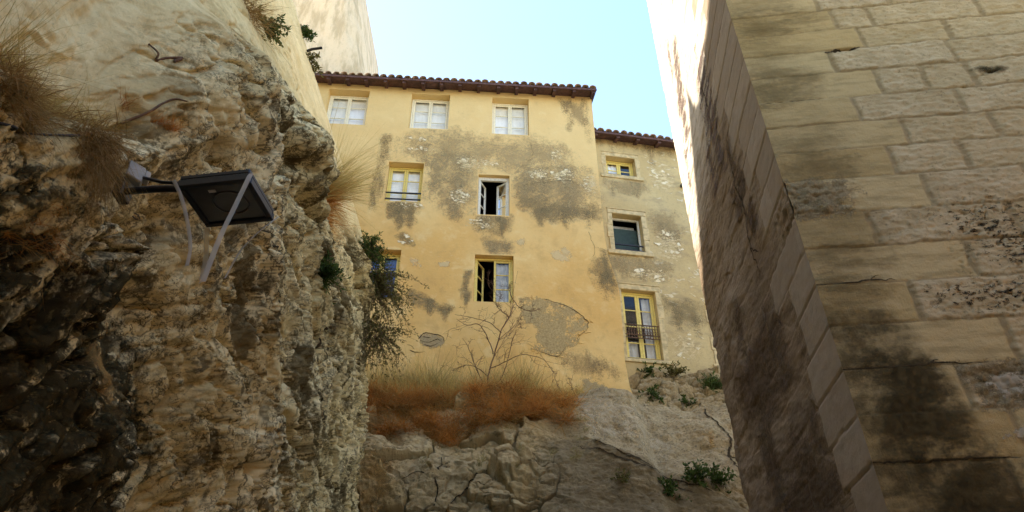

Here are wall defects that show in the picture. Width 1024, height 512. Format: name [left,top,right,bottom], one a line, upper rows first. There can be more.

damp [416,134,598,225]
damp [595,250,670,292]
spalling [624,0,888,512]
crack [816,275,895,285]
spalling [419,333,445,348]
peeling [518,295,593,358]
damp [827,311,1024,512]